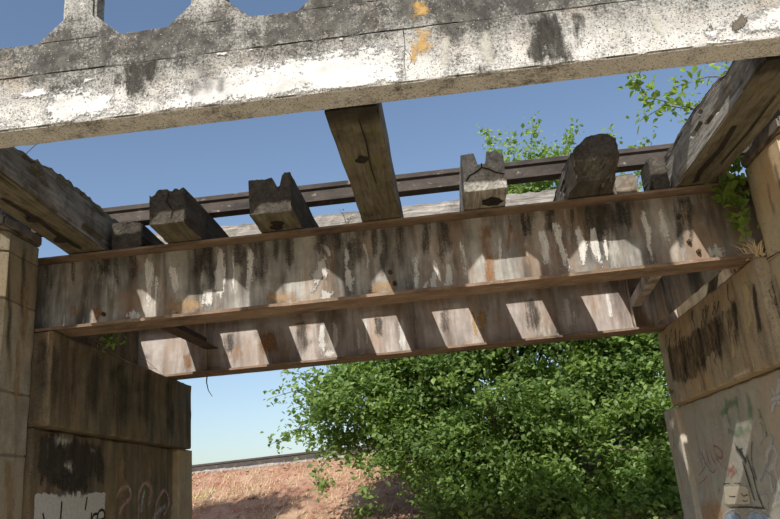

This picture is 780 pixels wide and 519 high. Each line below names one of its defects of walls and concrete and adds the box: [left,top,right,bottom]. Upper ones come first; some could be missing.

corrosion [414,2,428,15]
corrosion [410,30,432,62]
water stain [527,12,585,62]
water stain [111,61,156,99]
water stain [194,239,293,306]
water stain [316,231,362,265]
water stain [371,227,406,273]
water stain [411,223,453,289]
corrosion [482,227,495,282]
water stain [37,432,105,494]